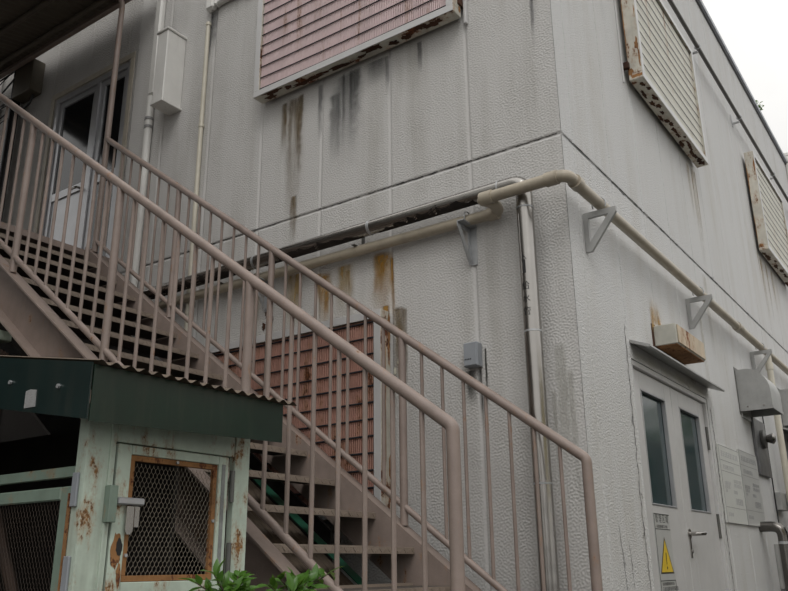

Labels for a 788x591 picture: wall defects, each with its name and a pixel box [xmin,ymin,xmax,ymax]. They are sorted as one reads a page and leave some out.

corrosion [261,18,442,138]
corrosion [620,1,705,195]
corrosion [375,254,394,292]
corrosion [754,218,788,286]
crack [619,324,651,590]